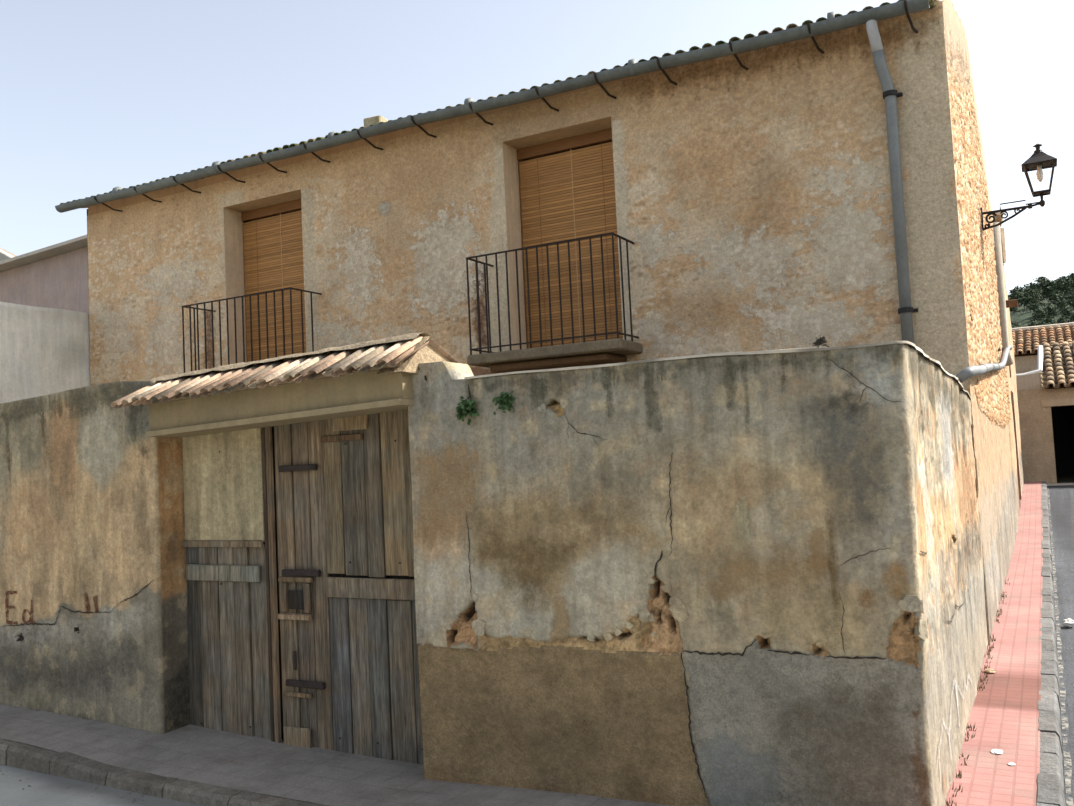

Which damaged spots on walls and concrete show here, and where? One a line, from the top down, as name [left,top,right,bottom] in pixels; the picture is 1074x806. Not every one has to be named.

crack [826,357,902,403]
water stain [869,345,968,459]
crack [654,453,673,578]
crack [9,581,152,627]
peeling [444,576,689,656]
spalling [757,632,770,649]
spalling [803,641,829,659]
spalling [886,595,928,668]
water stain [937,675,972,774]